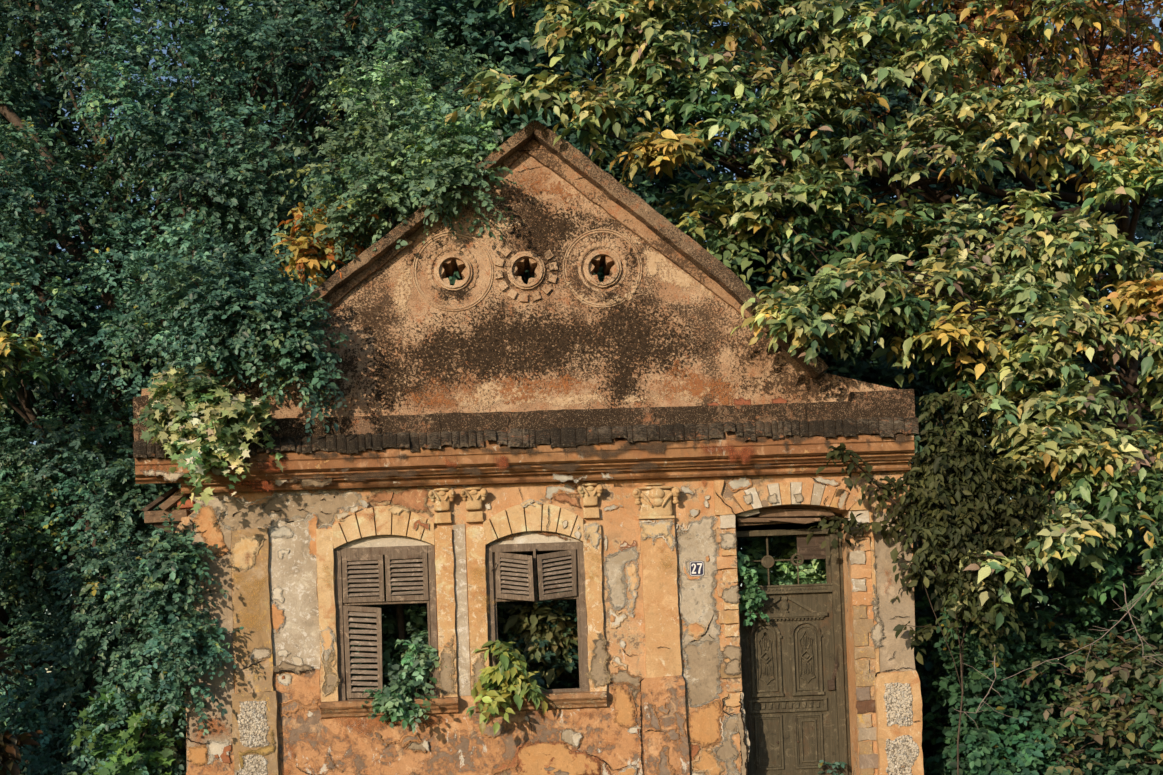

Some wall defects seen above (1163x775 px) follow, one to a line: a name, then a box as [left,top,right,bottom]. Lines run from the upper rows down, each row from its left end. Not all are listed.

leakage [475,212,526,252]
leakage [390,264,420,315]
leakage [564,231,714,307]
leakage [452,377,710,412]
peeling [520,473,587,509]
peeling [270,585,285,633]
flaking render [493,485,742,775]
peeling [870,550,885,648]
flaking render [248,646,303,686]